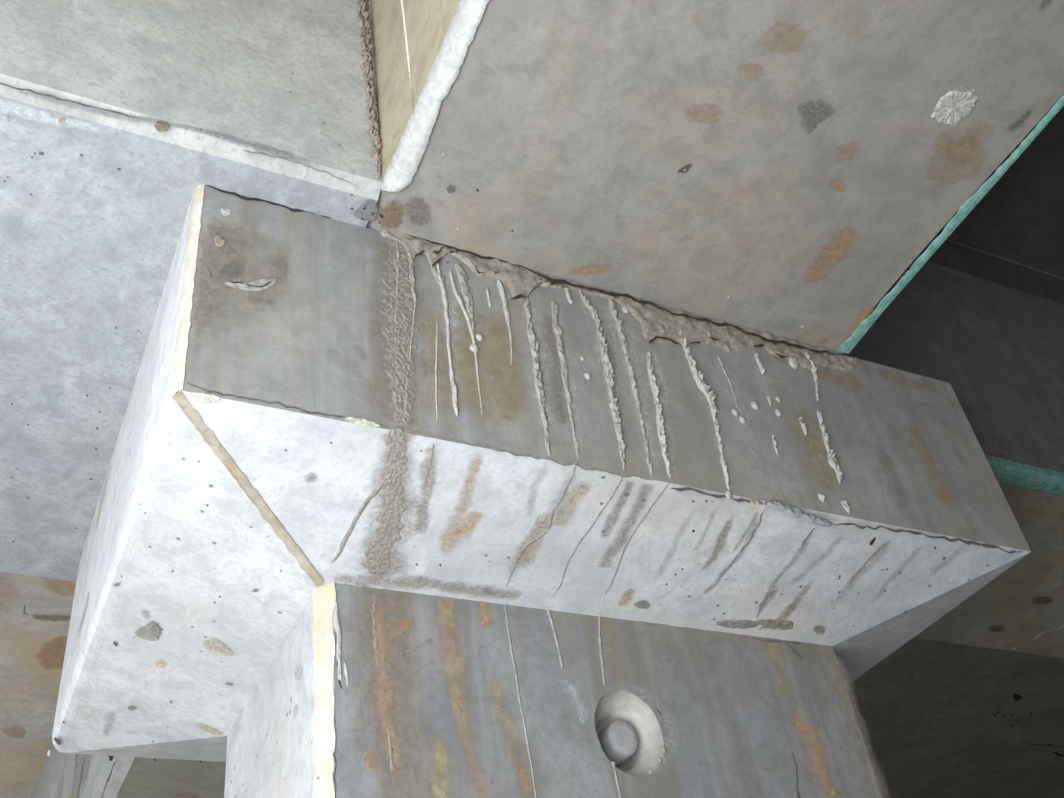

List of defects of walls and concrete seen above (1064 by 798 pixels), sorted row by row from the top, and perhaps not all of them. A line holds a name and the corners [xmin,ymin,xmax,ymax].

crack [0,83,357,186]
spalling [931,86,983,150]
damp [374,246,434,529]
damp [581,302,673,468]
damp [341,545,517,597]
damp [603,485,648,567]